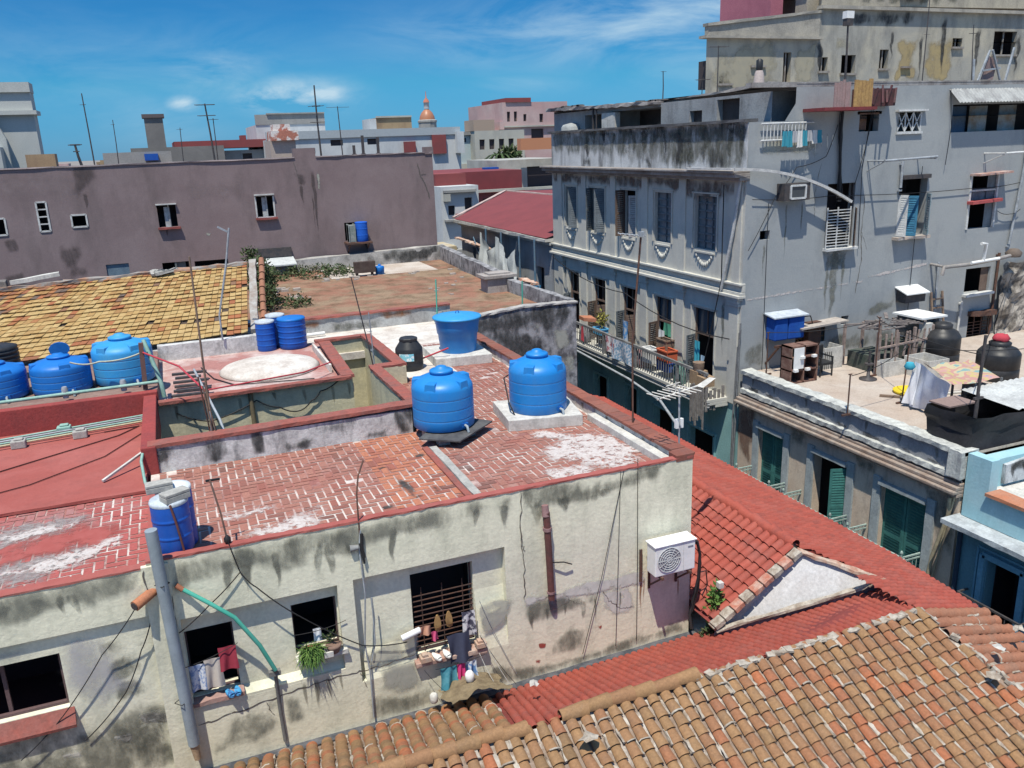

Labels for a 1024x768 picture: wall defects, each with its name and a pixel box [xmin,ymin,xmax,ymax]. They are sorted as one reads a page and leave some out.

peeling [895,41,952,81]
damp [554,123,746,168]
damp [523,431,658,509]
damp [0,515,128,622]
damp [204,514,319,585]
damp [319,512,441,555]